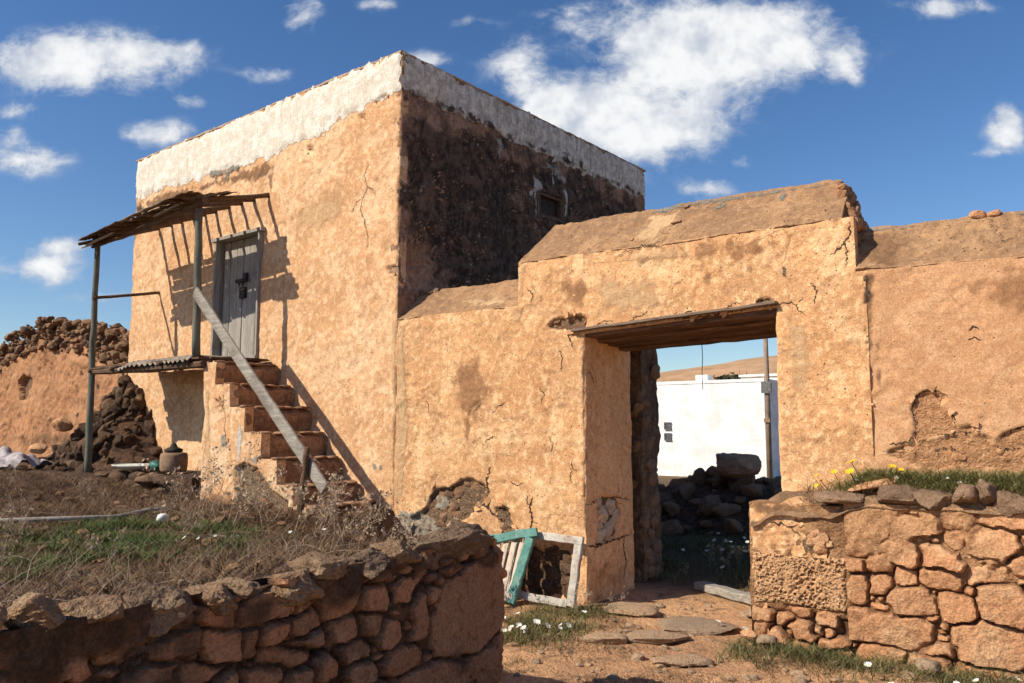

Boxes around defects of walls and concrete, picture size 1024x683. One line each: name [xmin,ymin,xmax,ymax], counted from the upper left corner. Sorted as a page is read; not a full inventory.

crack [353,166,375,247]
leakage [397,102,640,296]
crack [830,222,851,266]
spalling [550,308,587,347]
leakage [562,281,586,305]
leakage [455,364,485,438]
spalling [889,386,1024,478]
spalling [411,479,517,554]
spalling [596,497,623,544]